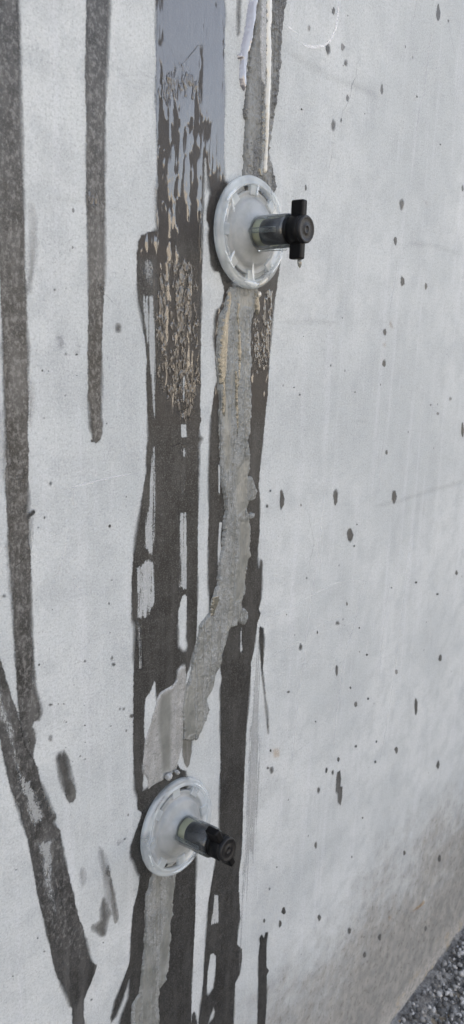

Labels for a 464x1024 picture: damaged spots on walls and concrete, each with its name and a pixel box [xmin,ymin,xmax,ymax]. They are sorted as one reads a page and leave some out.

damp [0,0,117,1024]
damp [111,0,280,1024]
damp [257,907,286,1024]